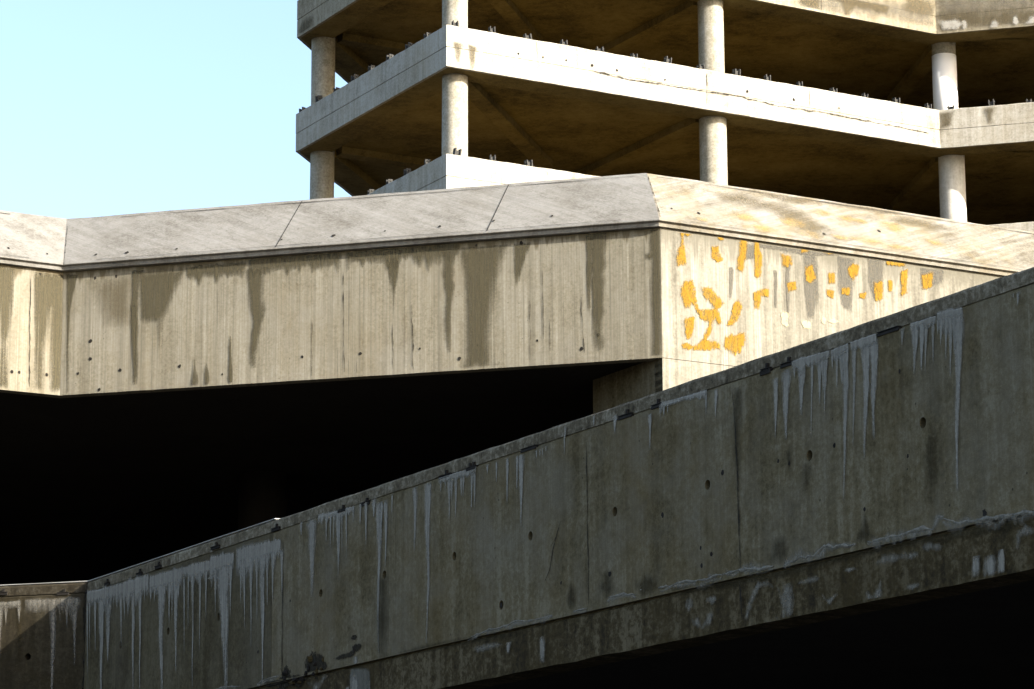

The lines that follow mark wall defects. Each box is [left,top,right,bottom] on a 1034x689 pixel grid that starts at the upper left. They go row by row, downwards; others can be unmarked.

leakage [0,267,14,387]
leakage [34,274,78,391]
leakage [103,243,530,385]
leakage [586,233,606,348]
leakage [645,230,662,355]
leakage [774,334,878,494]
leakage [901,307,963,486]
leakage [0,539,283,689]
leakage [300,496,393,634]
leakage [413,454,523,614]